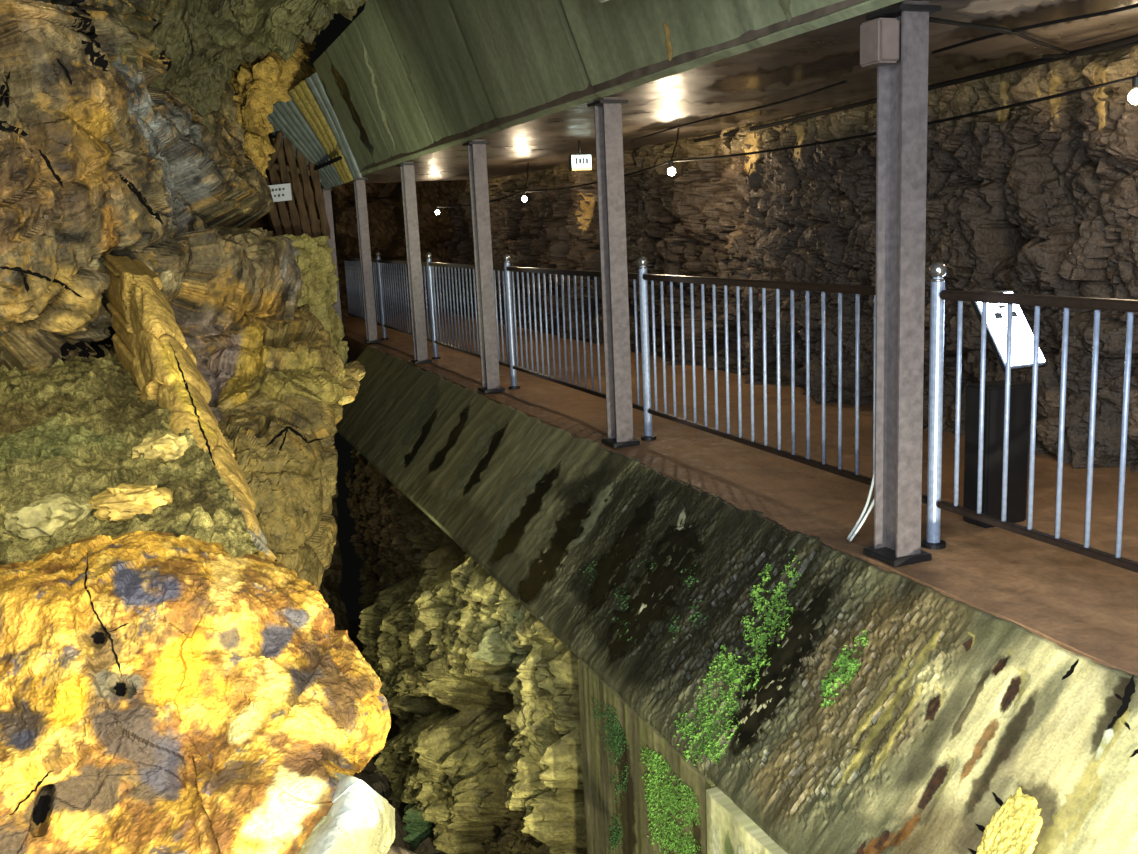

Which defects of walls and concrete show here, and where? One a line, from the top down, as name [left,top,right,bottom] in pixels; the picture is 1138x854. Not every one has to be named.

leakage [729,578,835,755]
leakage [617,735,636,854]